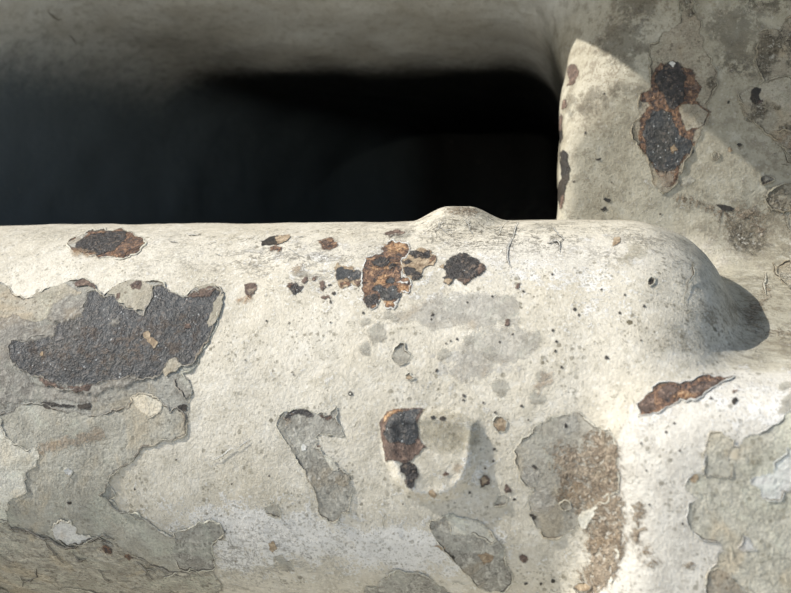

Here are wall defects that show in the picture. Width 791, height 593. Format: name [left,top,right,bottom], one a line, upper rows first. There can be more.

corrosion [630,0,719,193]
peeling [727,15,791,159]
corrosion [66,227,147,260]
corrosion [287,229,485,310]
crack [763,262,791,295]
peeling [0,277,225,593]
peeling [276,406,354,524]
peeling [492,411,508,432]
corrosion [636,374,735,417]
peeling [681,382,791,593]
peeling [363,569,448,593]
peeling [429,514,513,593]